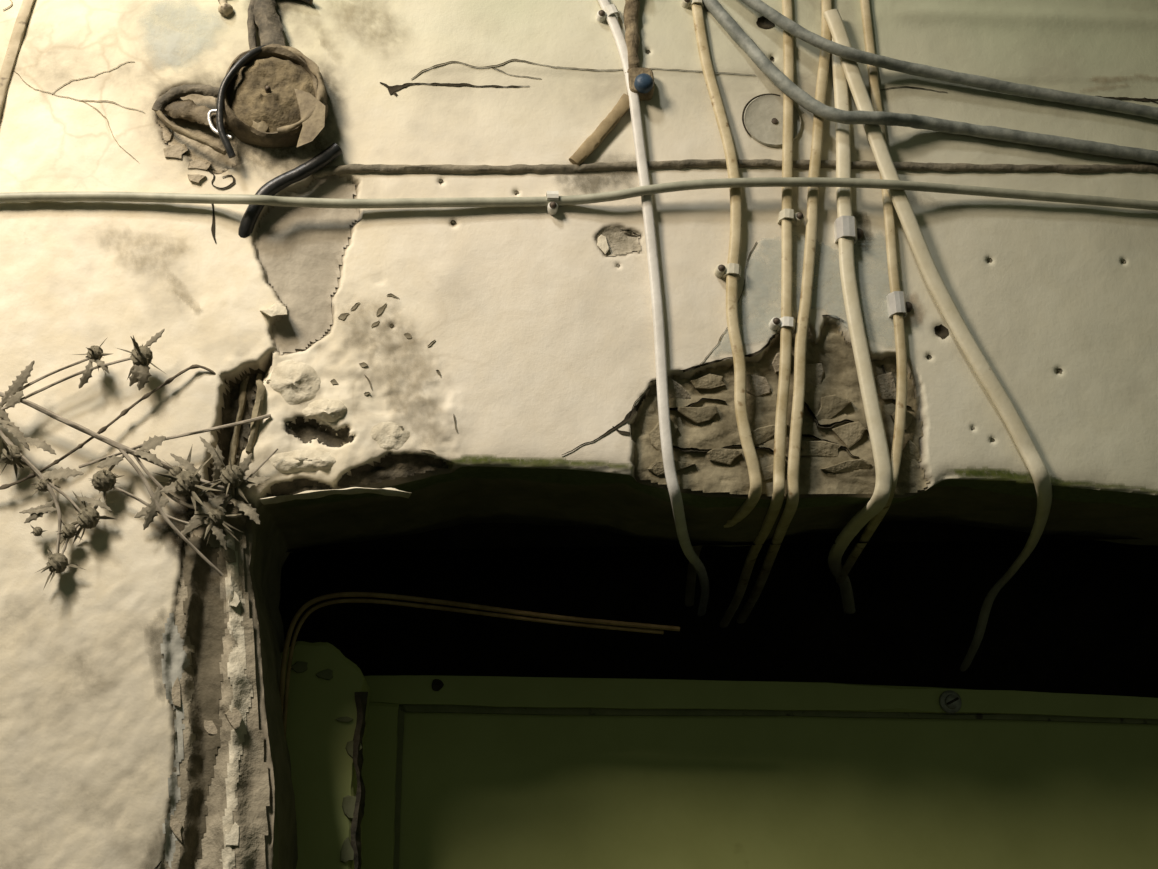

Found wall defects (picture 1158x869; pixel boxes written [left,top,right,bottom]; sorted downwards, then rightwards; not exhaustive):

flaking render [159,84,217,109]
flaking render [156,114,240,183]
crack [380,59,753,96]
flaking render [253,175,360,355]
flaking render [597,226,641,256]
flaking render [631,240,876,496]
flaking render [856,236,930,495]
flaking render [160,368,448,869]